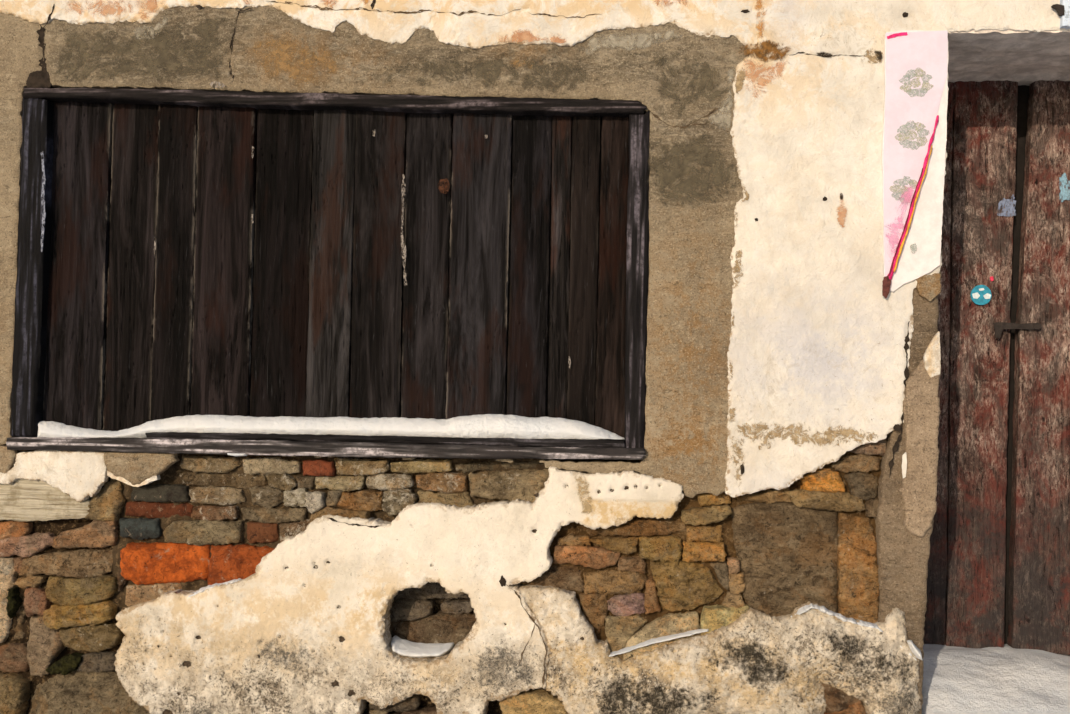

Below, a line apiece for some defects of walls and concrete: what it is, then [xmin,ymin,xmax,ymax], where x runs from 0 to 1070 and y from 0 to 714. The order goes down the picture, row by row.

crack [36,5,54,73]
crack [229,0,595,81]
spalling [26,70,53,89]
peeling [735,67,746,93]
peeling [734,250,743,284]
spalling [520,408,888,661]
spalling [0,445,568,714]
crack [508,586,547,690]
damp [597,674,720,714]
damp [708,634,797,695]
spalling [822,683,866,714]
damp [823,625,916,714]